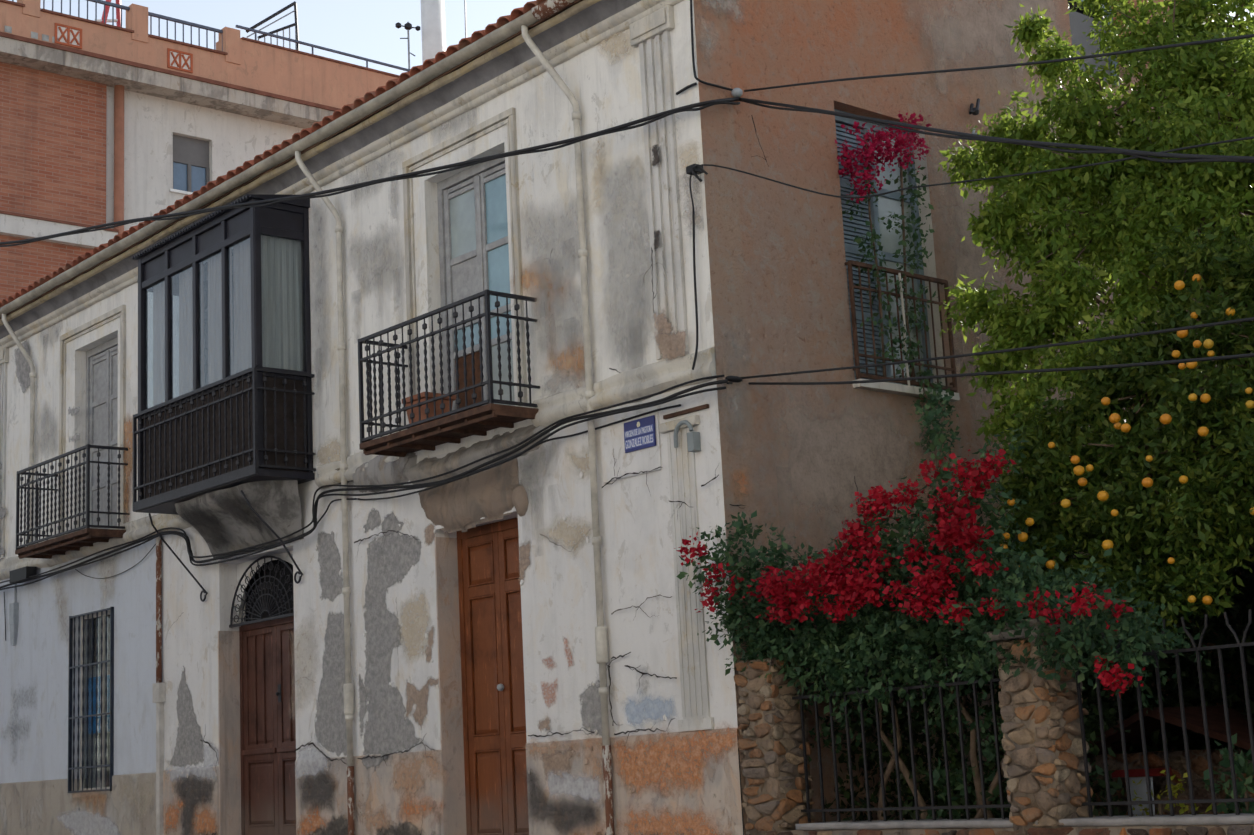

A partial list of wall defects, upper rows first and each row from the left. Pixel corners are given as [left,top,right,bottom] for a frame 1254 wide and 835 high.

spalling [296,509,439,777]
crack [611,595,672,618]
spalling [167,667,218,780]
leakage [175,773,213,835]
spalling [530,680,602,781]
crack [528,652,677,750]
peeling [616,727,736,794]